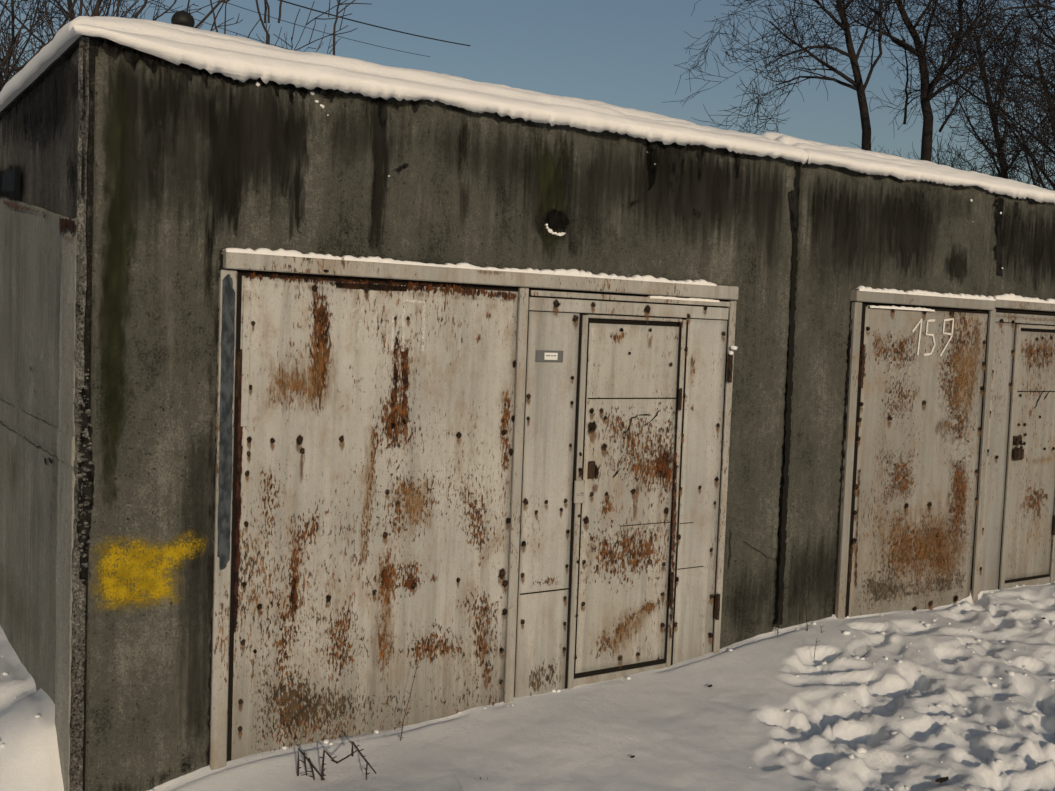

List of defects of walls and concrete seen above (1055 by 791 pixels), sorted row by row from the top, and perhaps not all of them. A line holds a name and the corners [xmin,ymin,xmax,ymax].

damp [100,61,309,500]
damp [341,98,389,246]
rust [245,259,516,410]
damp [494,127,781,250]
damp [812,181,941,273]
damp [947,246,967,284]
damp [189,451,214,727]
rust [233,316,511,752]
rust [499,391,531,470]
rust [521,392,694,667]
rust [852,310,1015,611]
rust [529,647,577,696]